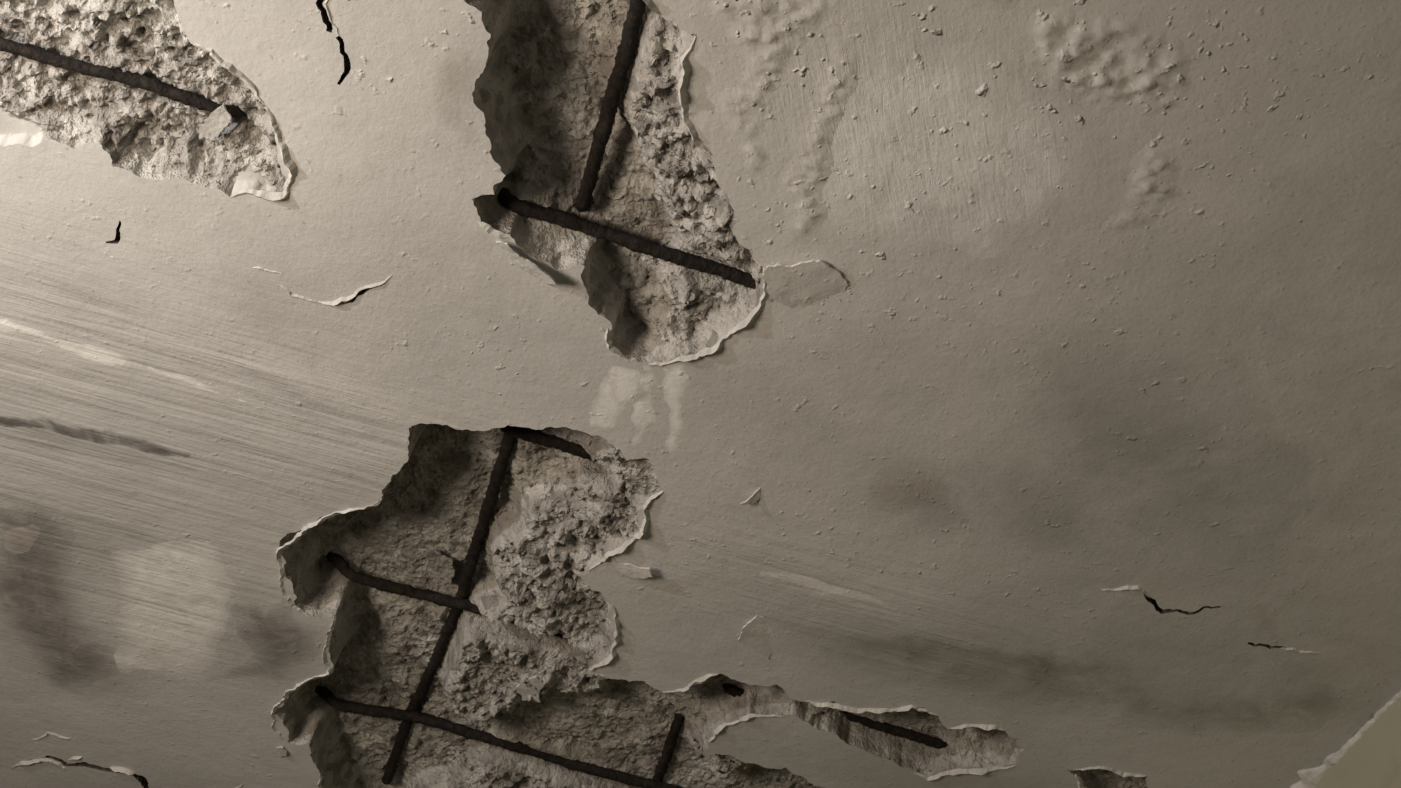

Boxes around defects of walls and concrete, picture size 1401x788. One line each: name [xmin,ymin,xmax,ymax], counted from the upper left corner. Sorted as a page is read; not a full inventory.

crack [316,0,351,85]
spalling [0,0,297,201]
spalling [464,0,848,366]
spalling [271,423,1024,788]
crack [1099,585,1220,615]
crack [11,731,149,788]
spalling [1068,766,1148,788]